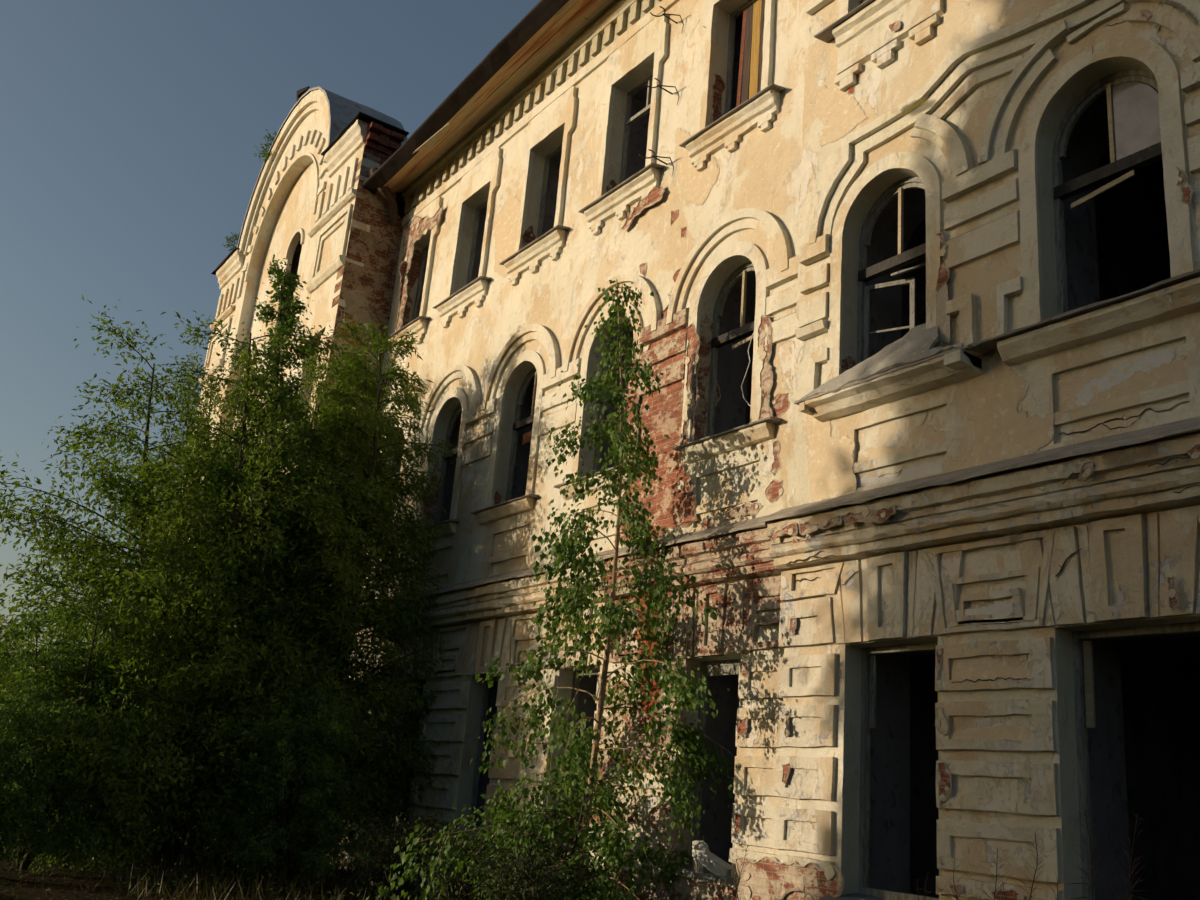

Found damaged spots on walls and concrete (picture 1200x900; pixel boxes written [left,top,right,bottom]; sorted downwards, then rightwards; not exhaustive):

spalling [710,73,726,124]
spalling [621,186,665,231]
peeling [670,128,719,238]
spalling [1176,167,1194,204]
spalling [661,268,681,319]
peeling [934,232,950,343]
spalling [757,315,790,420]
spalling [614,313,784,546]
crack [1059,401,1189,435]
spalling [770,503,896,544]
spalling [735,856,844,900]